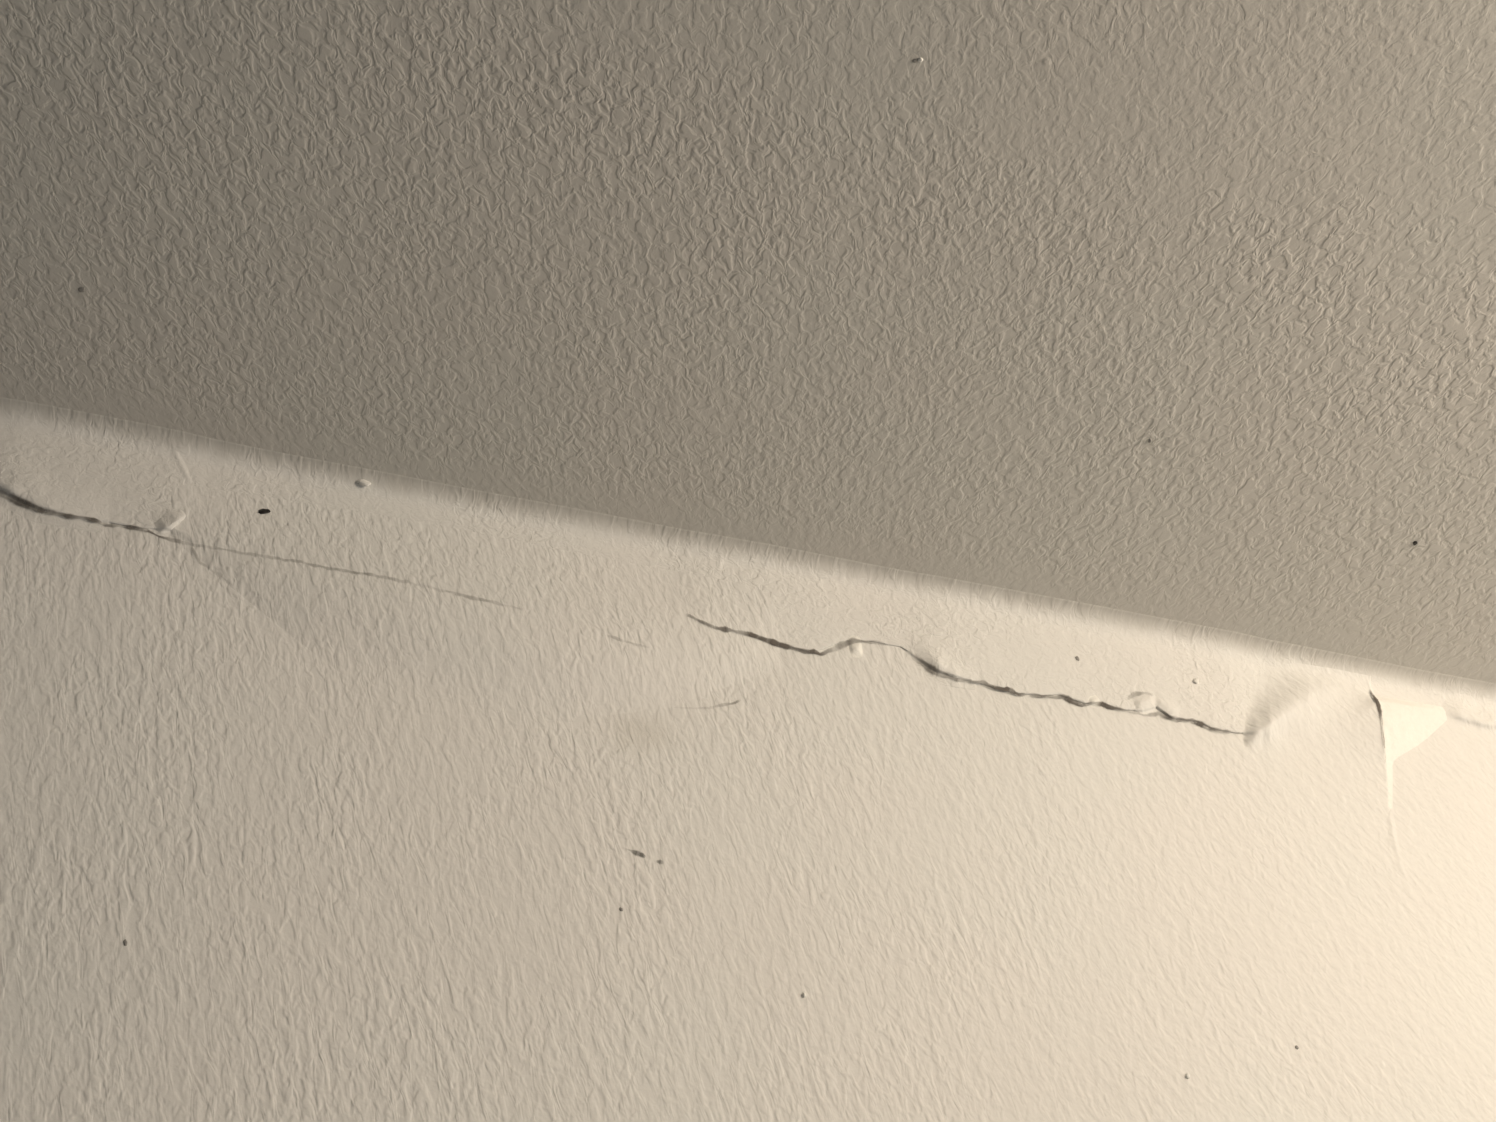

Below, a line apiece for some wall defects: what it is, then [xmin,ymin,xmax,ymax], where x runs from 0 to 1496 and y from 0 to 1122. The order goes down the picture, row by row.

crack [0,438,163,538]
crack [698,620,863,658]
crack [905,633,1216,731]